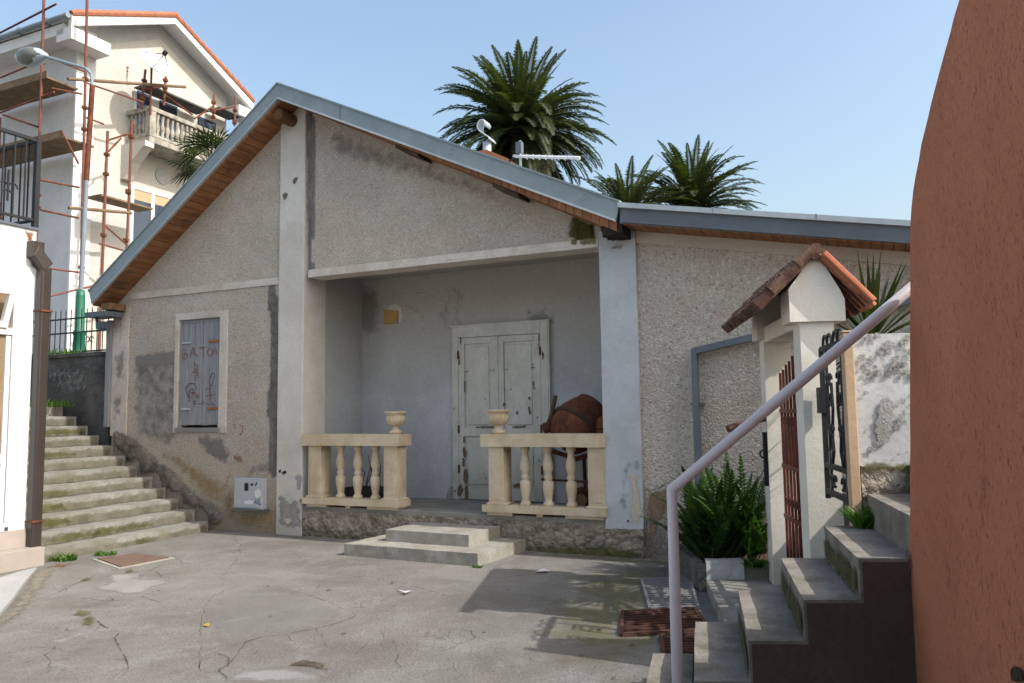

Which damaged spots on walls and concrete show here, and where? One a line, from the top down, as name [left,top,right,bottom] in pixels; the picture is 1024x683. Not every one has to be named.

peeling [857,333,910,396]
spalling [113,352,223,525]
peeling [279,469,302,527]
spalling [621,462,666,558]
crack [59,578,129,679]
crack [198,539,356,682]